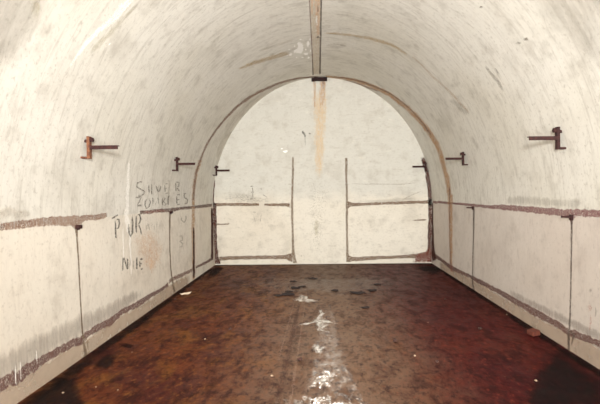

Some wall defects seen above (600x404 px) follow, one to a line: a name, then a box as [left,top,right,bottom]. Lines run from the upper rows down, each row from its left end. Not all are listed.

corrosion [191,0,453,280]
leakage [530,333,600,404]